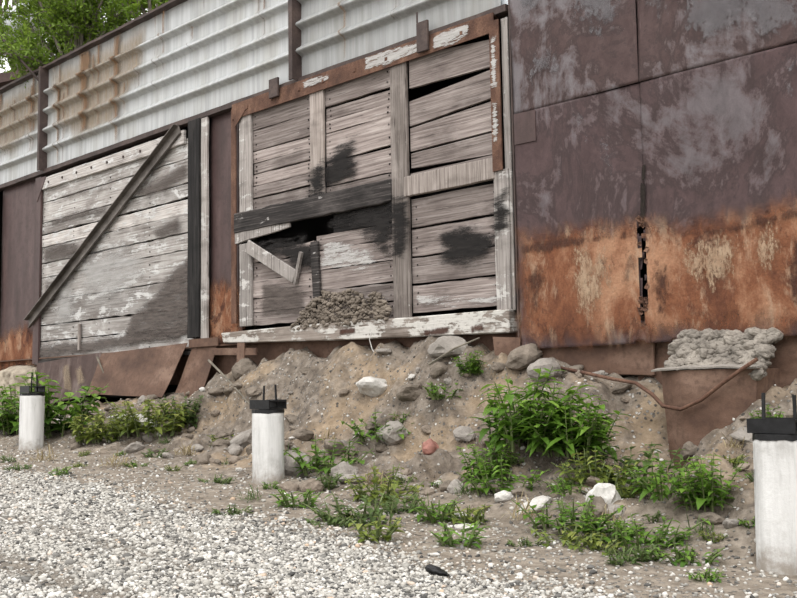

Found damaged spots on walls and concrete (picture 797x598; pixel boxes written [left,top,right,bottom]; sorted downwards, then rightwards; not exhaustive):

peeling [365,44,417,69]
peeling [433,25,469,48]
peeling [685,0,797,36]
corrosion [52,35,141,154]
peeling [303,76,329,88]
crack [635,165,656,334]
corrosion [521,204,797,343]
corrosion [209,282,240,340]
corrosion [0,327,37,371]